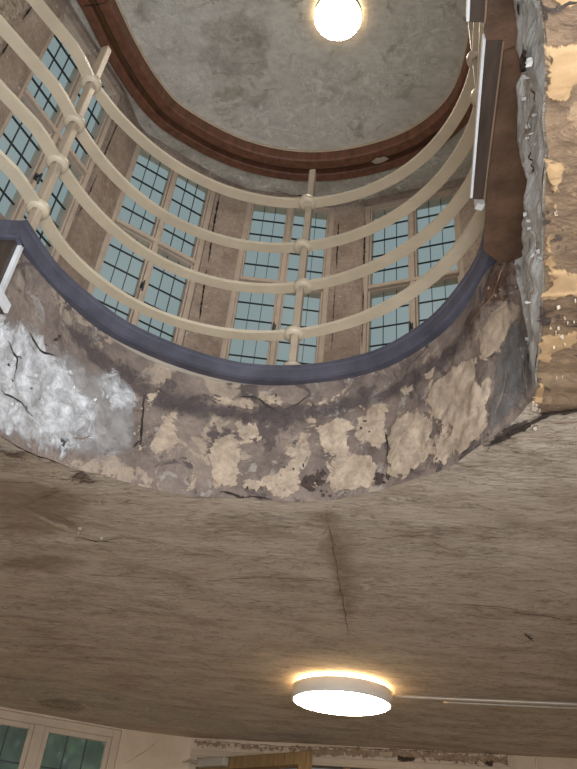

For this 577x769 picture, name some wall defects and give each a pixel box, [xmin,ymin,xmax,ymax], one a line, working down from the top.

spalling [519,45,533,82]
peeling [544,44,577,101]
crack [522,87,537,174]
peeling [544,158,565,193]
spalling [541,203,558,226]
peeling [536,235,577,363]
efflorescence [0,314,135,457]
peeling [208,301,511,499]
peeling [532,383,544,406]
peeling [149,412,179,458]
crack [210,507,348,628]
peeling [194,739,508,766]